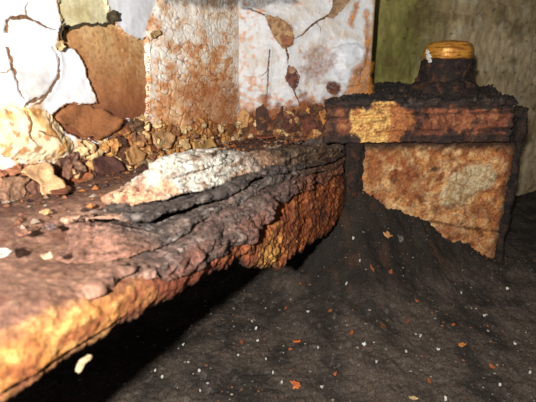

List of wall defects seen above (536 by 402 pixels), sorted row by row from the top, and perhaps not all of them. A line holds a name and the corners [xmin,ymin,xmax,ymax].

crack [4,2,57,33]
peeling [265,13,295,49]
crack [0,47,60,107]
peeling [51,0,161,141]
peeling [285,65,300,91]
rust [347,10,371,95]
rust [21,162,67,195]
peeling [59,145,147,184]
rust [41,82,346,300]
rust [75,355,92,373]